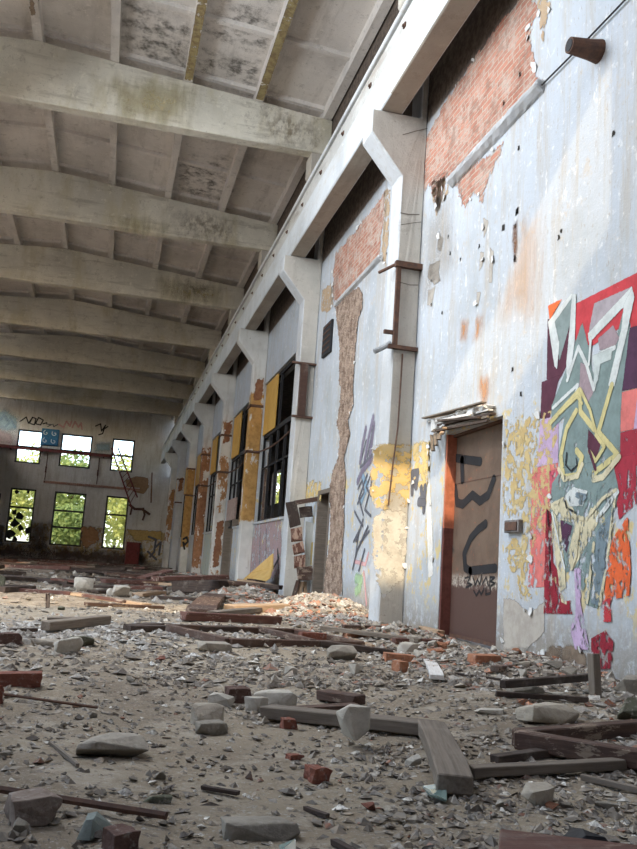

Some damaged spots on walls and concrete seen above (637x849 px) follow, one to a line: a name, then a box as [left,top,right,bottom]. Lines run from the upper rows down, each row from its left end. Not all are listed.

damp [140,0,208,81]
damp [252,0,299,101]
flaking render [424,0,551,215]
peeling [254,377,264,400]
flaking render [306,189,390,595]
peeling [500,410,587,666]